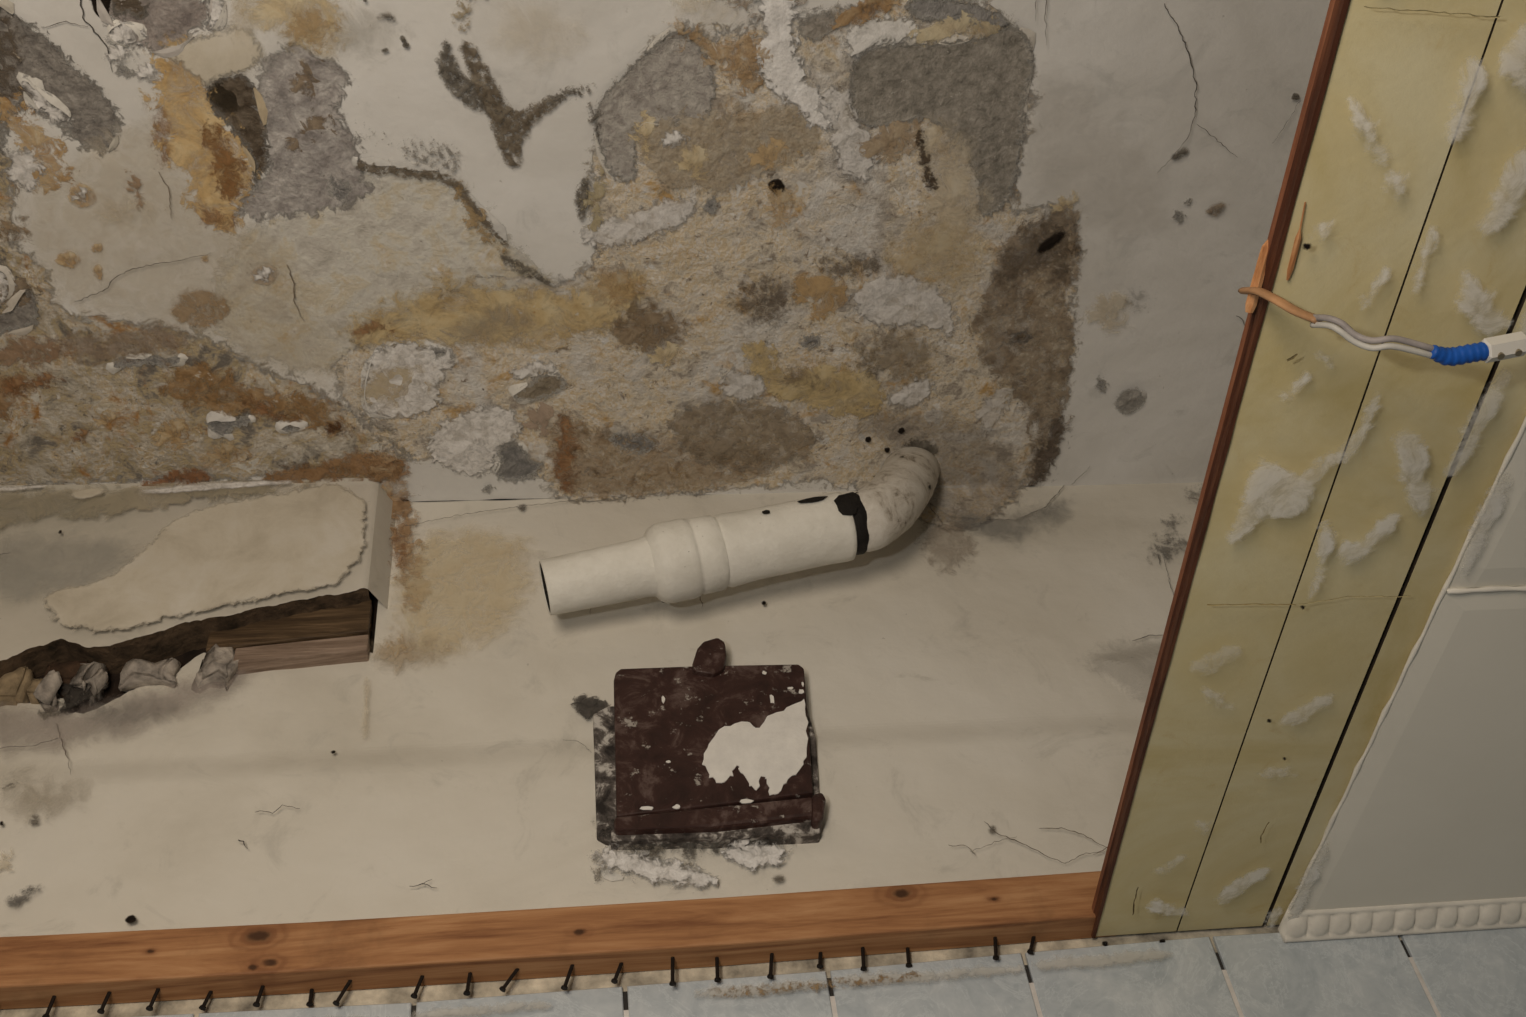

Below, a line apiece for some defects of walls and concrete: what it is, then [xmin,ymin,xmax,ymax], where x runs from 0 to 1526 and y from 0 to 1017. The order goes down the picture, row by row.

crack [1160,3,1237,170]
peeling [0,0,1087,633]
spalling [1095,375,1147,414]